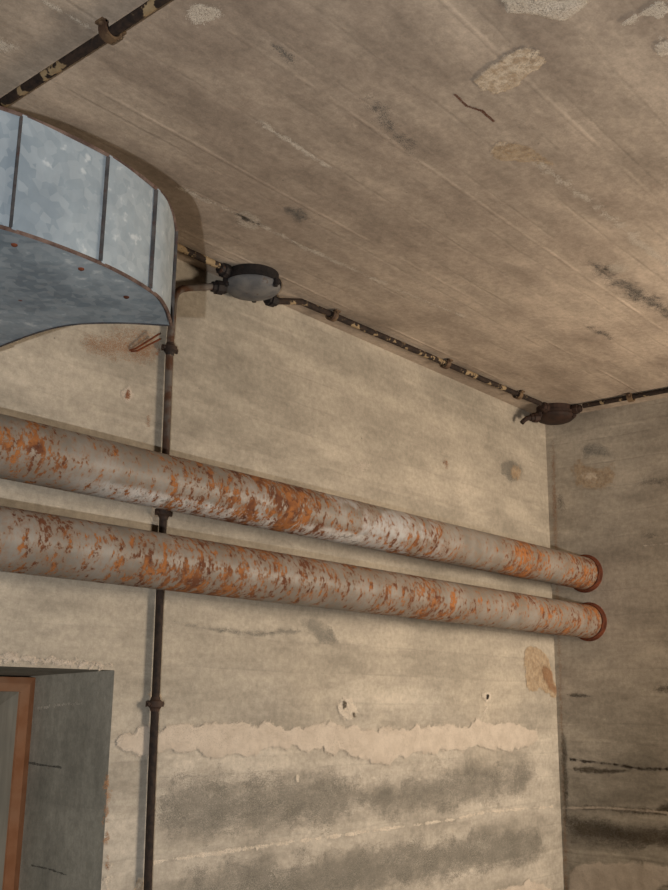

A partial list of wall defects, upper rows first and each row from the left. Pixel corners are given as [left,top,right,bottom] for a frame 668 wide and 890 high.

spalling [473,47,546,94]
water stain [336,696,358,721]
water stain [153,754,553,890]
water stain [565,814,668,853]